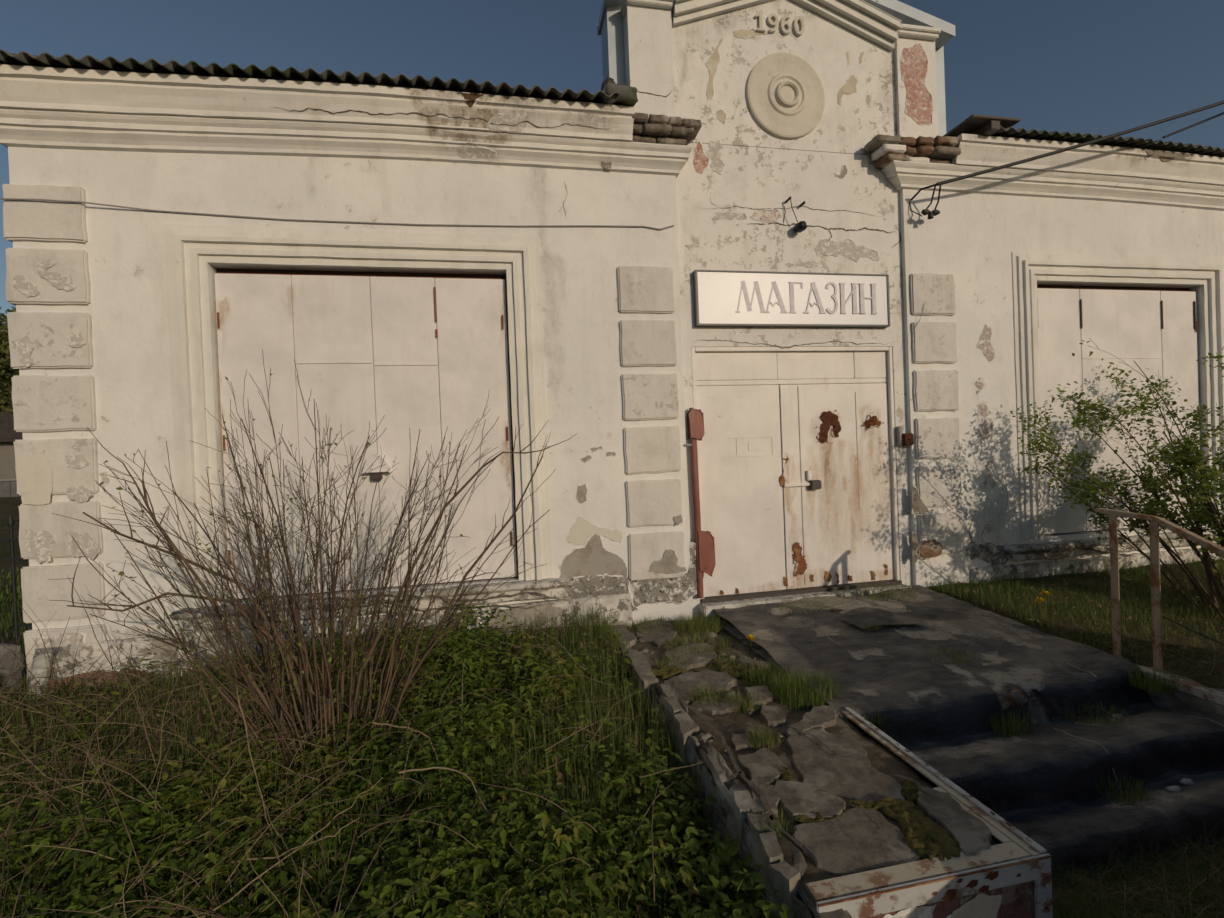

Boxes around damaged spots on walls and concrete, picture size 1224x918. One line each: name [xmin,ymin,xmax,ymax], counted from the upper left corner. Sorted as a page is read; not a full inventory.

peeling [705,28,768,123]
peeling [899,43,933,126]
crack [274,107,611,129]
peeling [693,140,725,175]
crack [702,198,901,247]
peeling [786,238,880,268]
peeling [976,324,994,361]
rust [816,410,841,444]
rust [862,412,884,431]
peeling [395,483,697,636]
rust [784,542,853,586]
spalling [912,532,943,563]